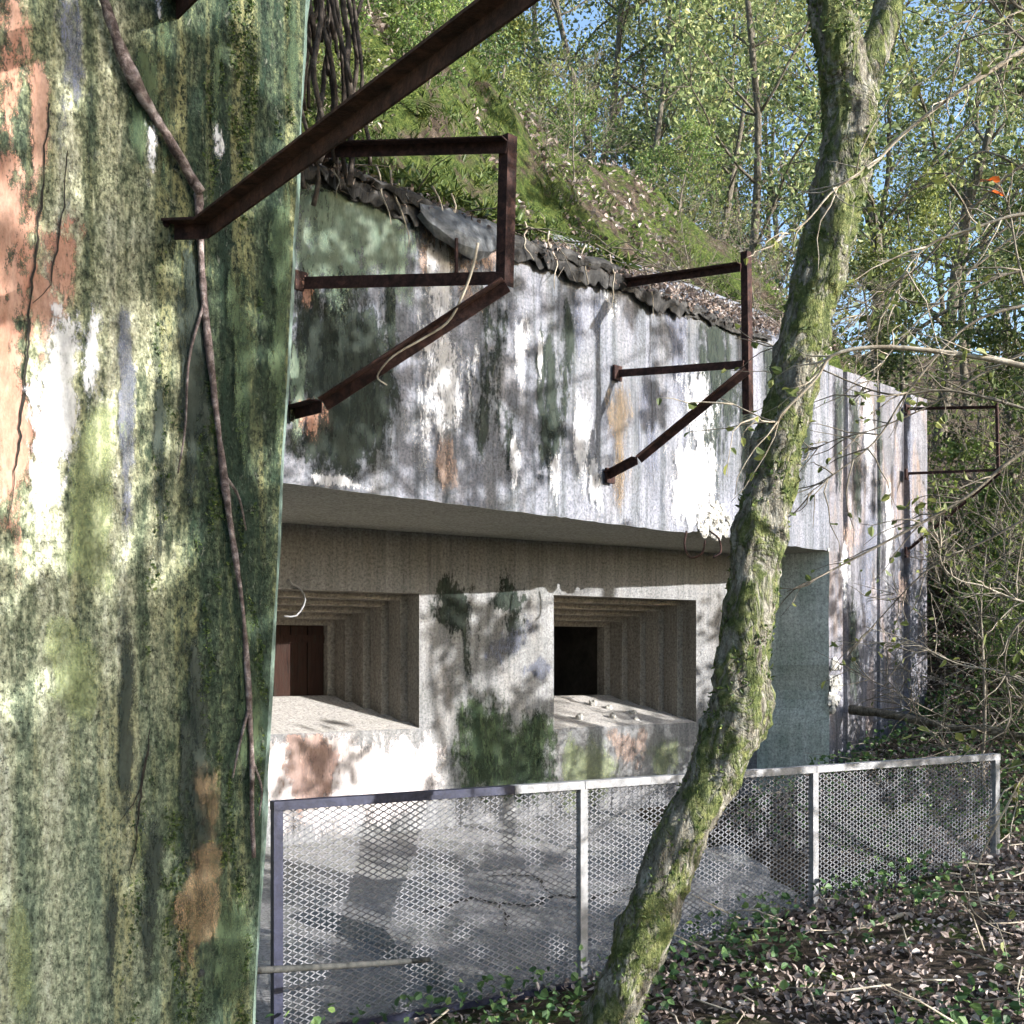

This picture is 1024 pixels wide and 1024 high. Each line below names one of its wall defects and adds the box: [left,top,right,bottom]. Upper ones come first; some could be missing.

crack [8,103,68,521]
corrosion [0,0,84,557]
leakage [226,185,617,508]
leakage [429,569,538,675]
leakage [524,656,551,681]
corrosion [606,382,633,504]
leakage [638,378,661,483]
leakage [835,371,928,705]